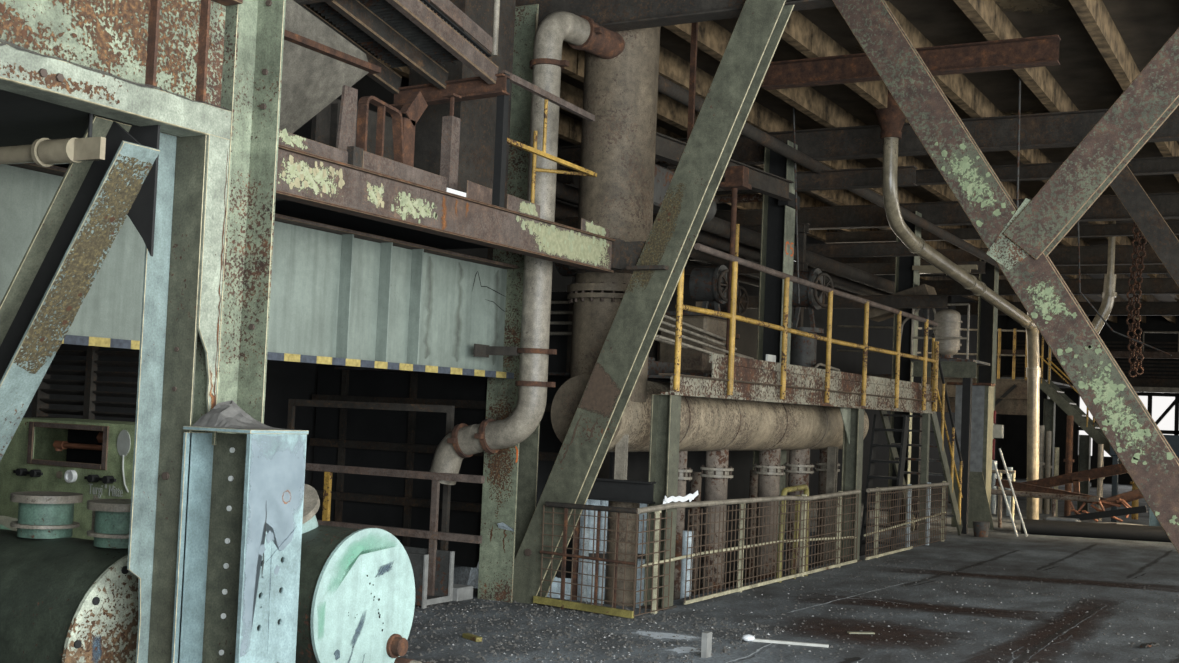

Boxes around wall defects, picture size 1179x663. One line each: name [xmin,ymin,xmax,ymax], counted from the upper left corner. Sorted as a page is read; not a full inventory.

corrosion [0,0,217,104]
peeling [278,128,345,197]
corrosion [13,154,152,374]
peeling [367,182,437,223]
peeling [516,201,610,268]
corrosion [210,204,226,408]
crack [788,544,1096,613]
crack [1128,550,1172,579]
corrosion [76,573,133,663]
crack [726,643,777,663]
crack [840,655,860,663]